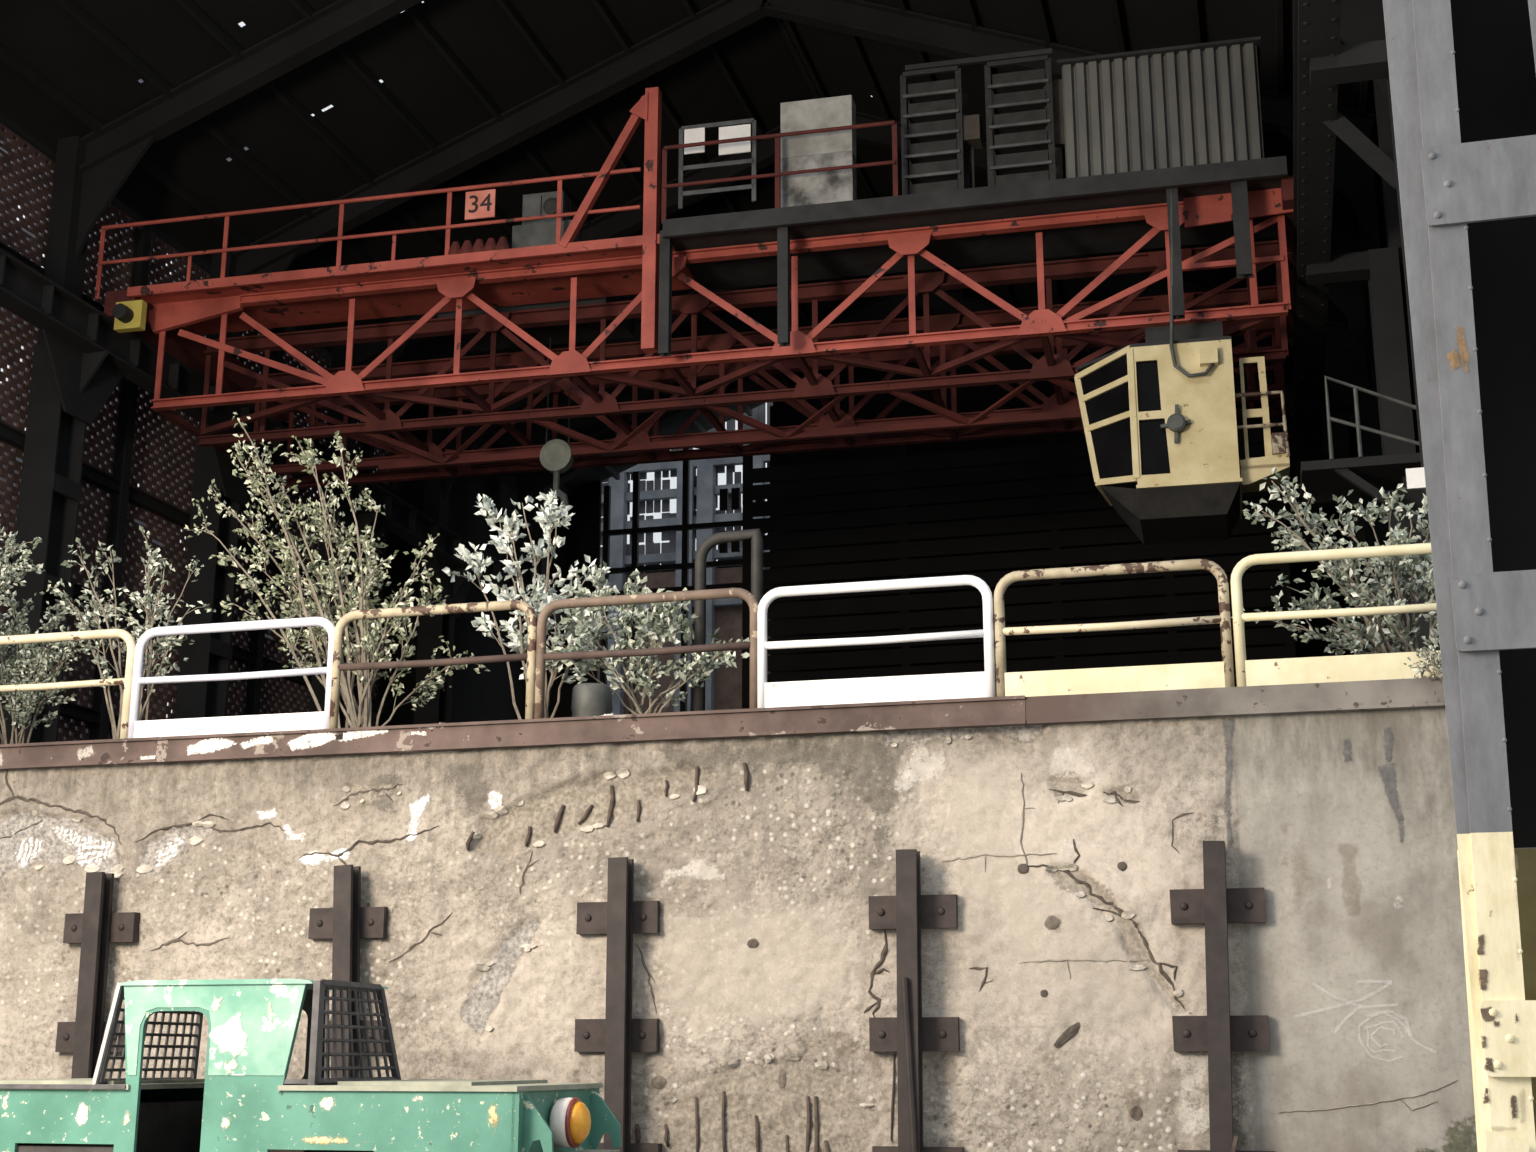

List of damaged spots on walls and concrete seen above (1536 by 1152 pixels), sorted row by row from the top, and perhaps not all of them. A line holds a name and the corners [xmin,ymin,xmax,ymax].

corrosion [1447,327,1468,371]
spalling [0,810,217,879]
crack [0,770,438,865]
peeling [187,729,388,755]
water stain [1343,739,1352,762]
water stain [1379,728,1404,842]
crack [942,773,1193,1014]